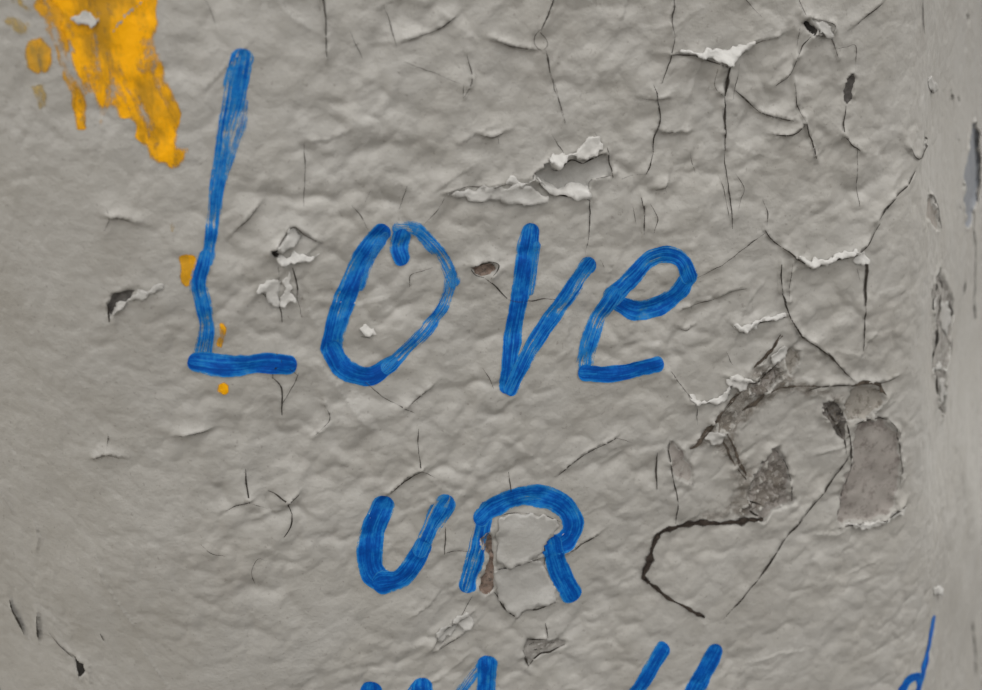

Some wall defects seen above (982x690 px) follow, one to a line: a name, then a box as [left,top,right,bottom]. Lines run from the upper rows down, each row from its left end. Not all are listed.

crack [494,0,566,123]
peeling [432,133,613,232]
peeling [106,283,164,322]
peeling [256,227,320,319]
crack [471,262,555,302]
crack [623,0,928,480]
crack [368,384,433,492]
peeling [705,412,795,522]
peeling [726,346,907,531]
crack [9,600,39,639]
peeling [479,512,560,619]
crack [728,459,848,614]